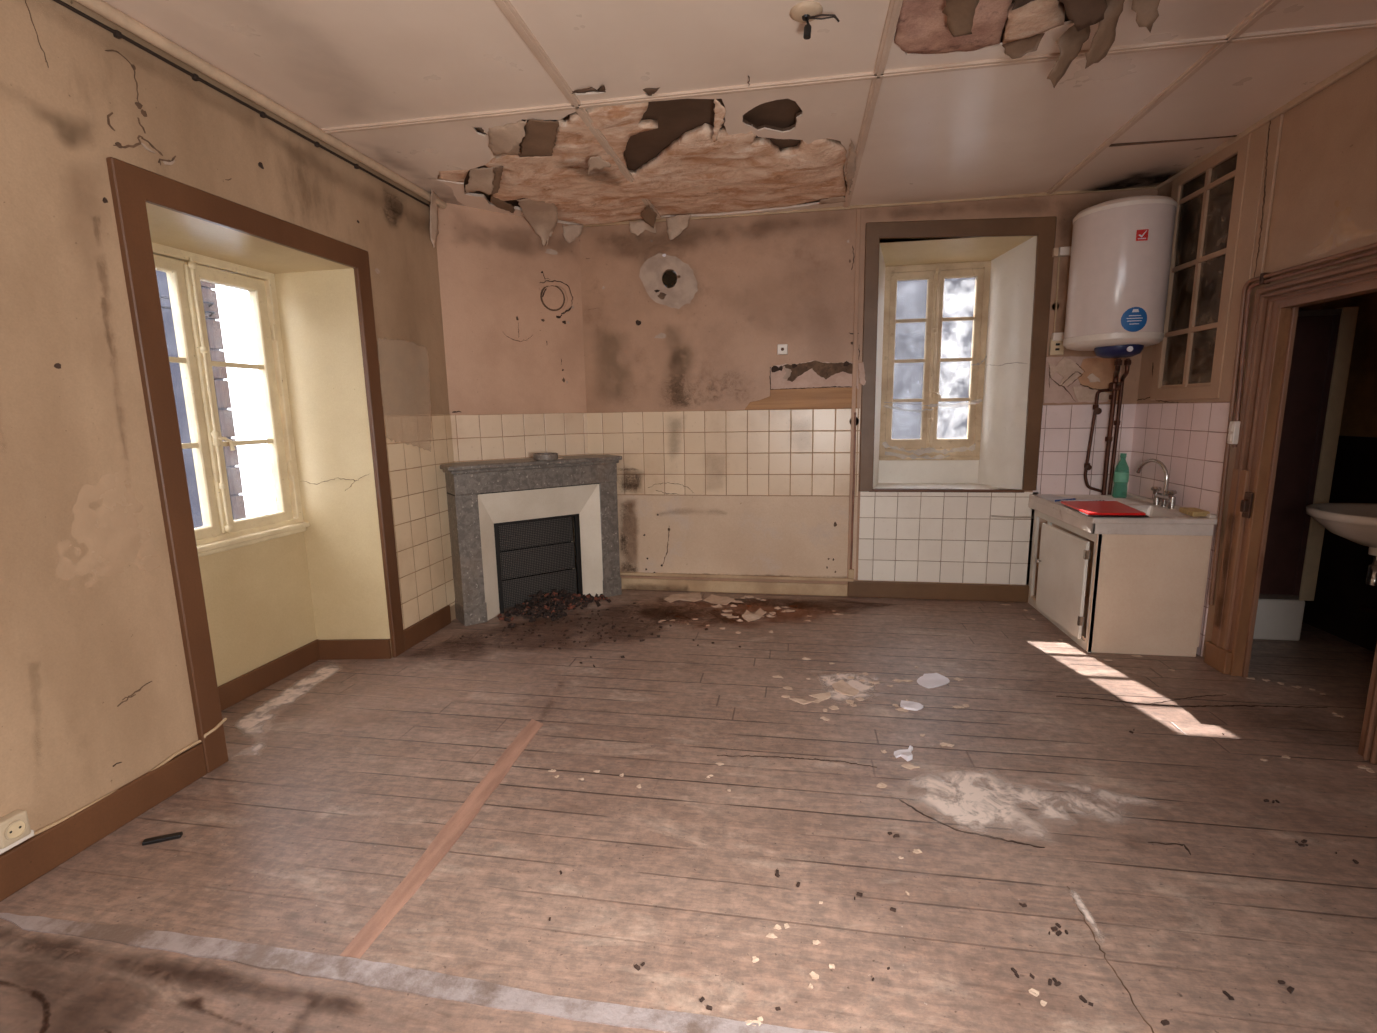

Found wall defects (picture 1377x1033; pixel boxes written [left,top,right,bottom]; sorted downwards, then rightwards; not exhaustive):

crack [25,0,49,68]
crack [105,49,176,165]
spalling [769,360,859,390]